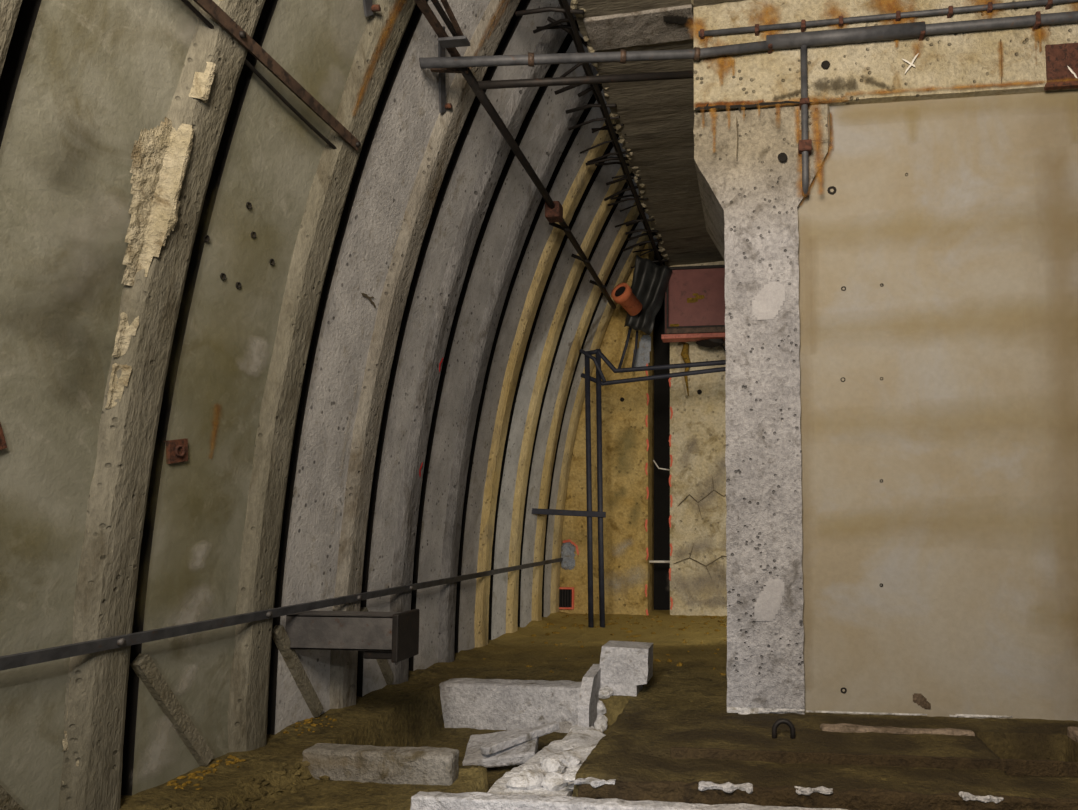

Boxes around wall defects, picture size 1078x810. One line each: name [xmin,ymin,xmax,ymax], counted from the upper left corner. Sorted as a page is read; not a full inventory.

rust [877,0,914,24]
peeling [189,62,216,103]
rust [719,57,734,79]
rust [952,79,1077,89]
rust [694,100,764,151]
rust [776,93,857,202]
peeling [121,117,194,287]
peeling [105,312,139,409]
crack [677,477,726,518]
crack [674,544,726,579]